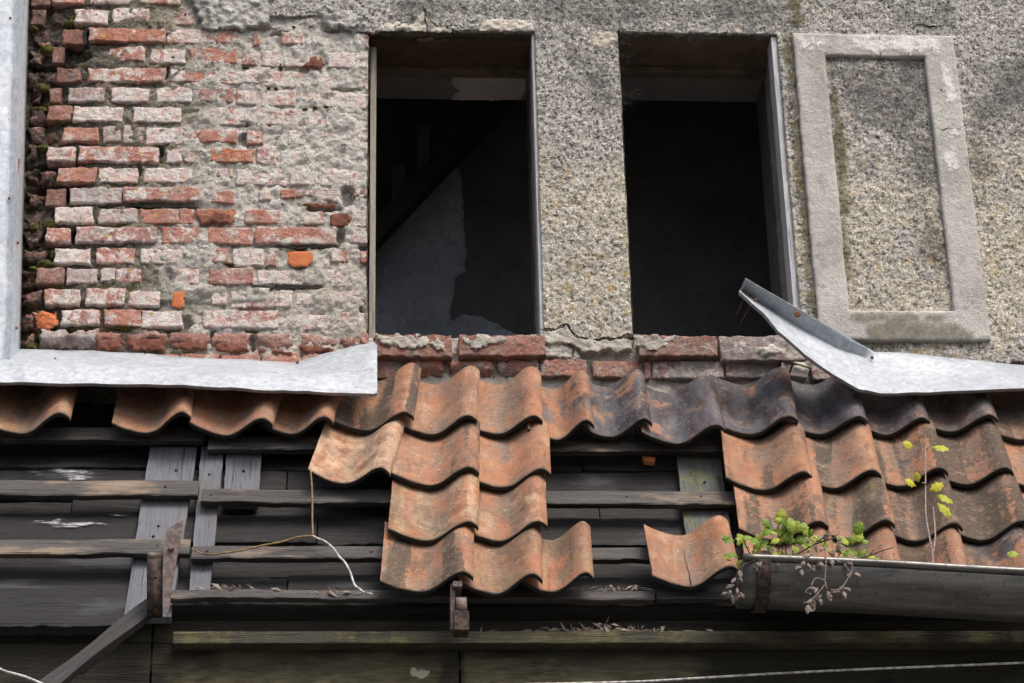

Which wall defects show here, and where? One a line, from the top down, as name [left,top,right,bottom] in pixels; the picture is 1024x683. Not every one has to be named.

peeling [192,0,451,35]
spalling [300,56,324,71]
spalling [199,212,232,227]
spalling [297,202,352,228]
spalling [287,251,313,267]
spalling [172,291,185,309]
spalling [36,311,58,331]
spalling [97,334,334,356]
crack [539,323,632,358]
peeling [55,469,93,480]